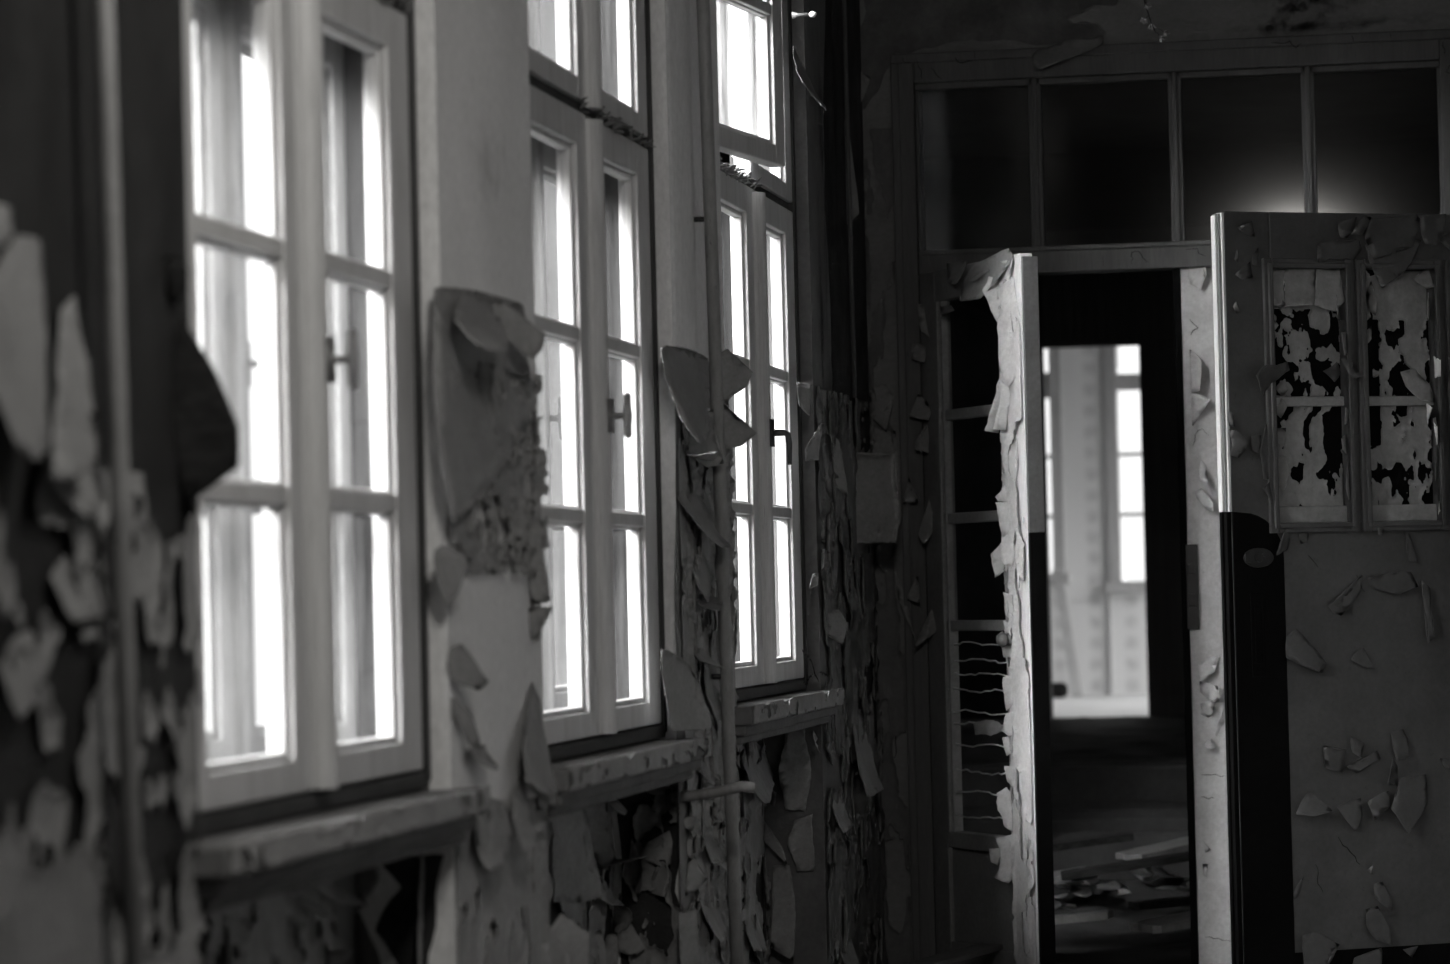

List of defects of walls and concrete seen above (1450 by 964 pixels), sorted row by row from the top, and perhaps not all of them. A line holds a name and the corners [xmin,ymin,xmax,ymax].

peeling [1188,267,1207,289]
peeling [1190,350,1210,425]
peeling [1228,214,1450,515]
peeling [130,0,900,964]
peeling [0,204,125,964]
peeling [918,248,1037,964]
peeling [1286,628,1327,673]
peeling [1198,655,1224,749]
peeling [1296,729,1427,833]
peeling [1302,932,1339,964]
peeling [1353,866,1418,964]